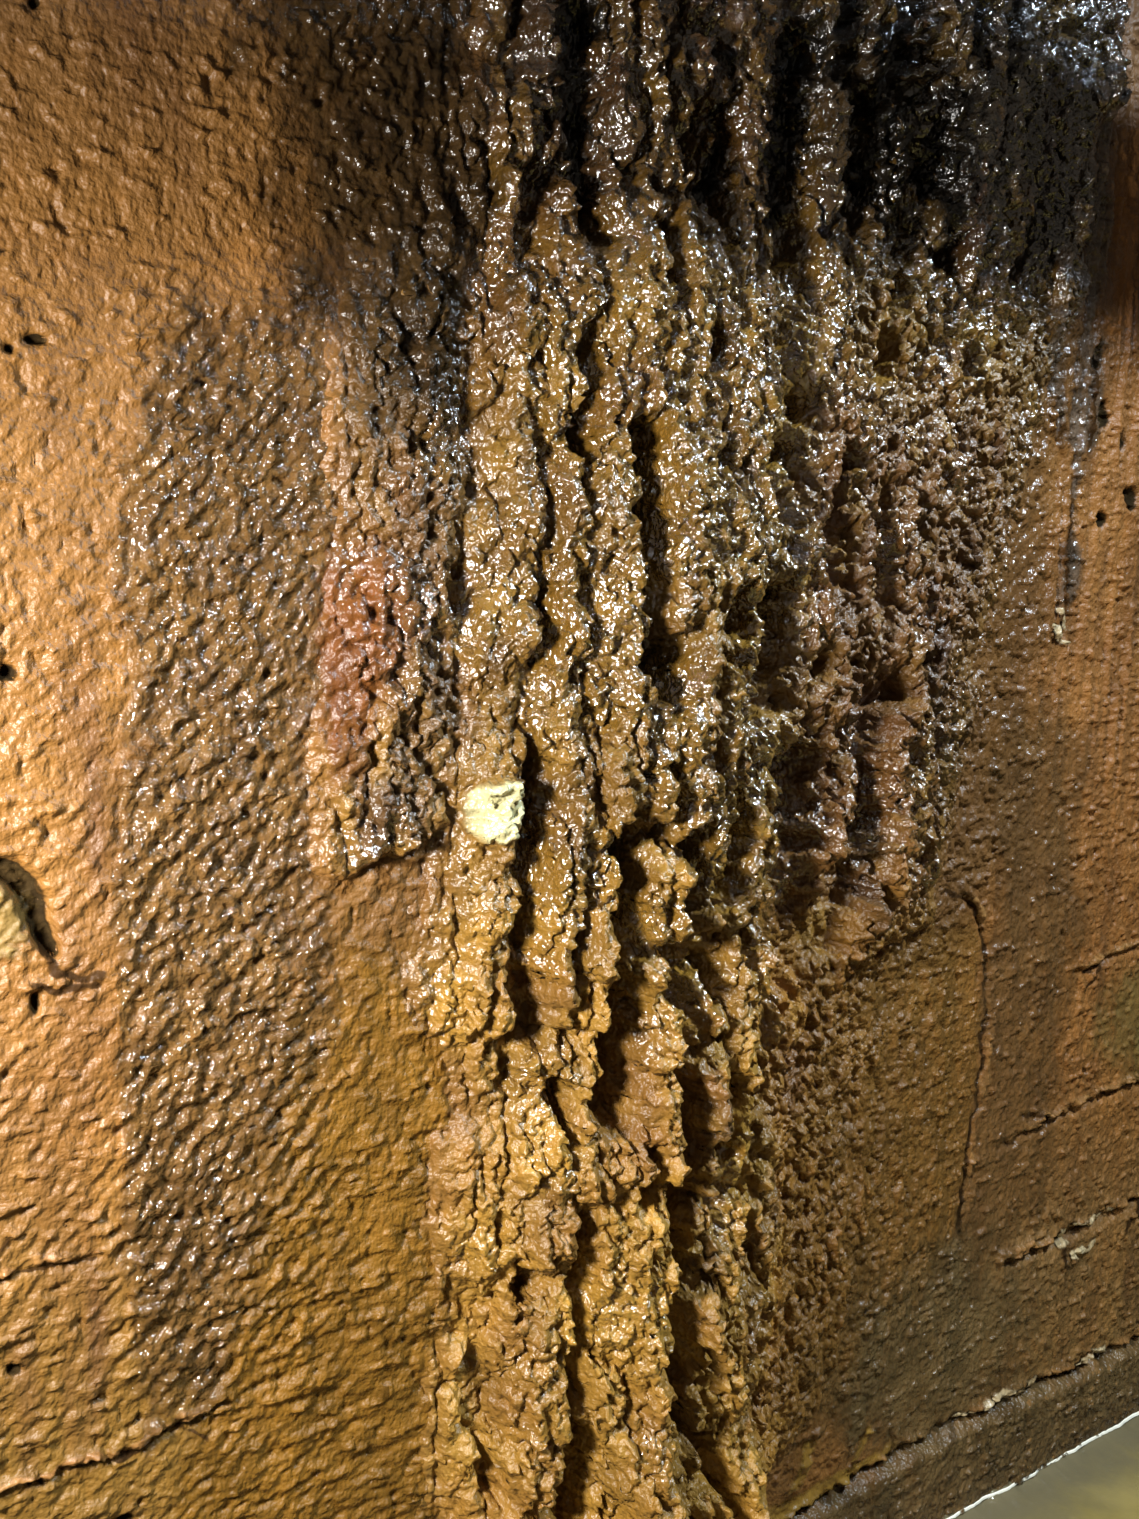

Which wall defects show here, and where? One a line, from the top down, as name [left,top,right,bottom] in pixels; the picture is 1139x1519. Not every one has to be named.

damp [114,289,339,1443]
damp [263,0,1139,1519]
crack [941,888,1139,1234]
crack [1011,1191,1139,1269]
crack [786,1325,1139,1519]